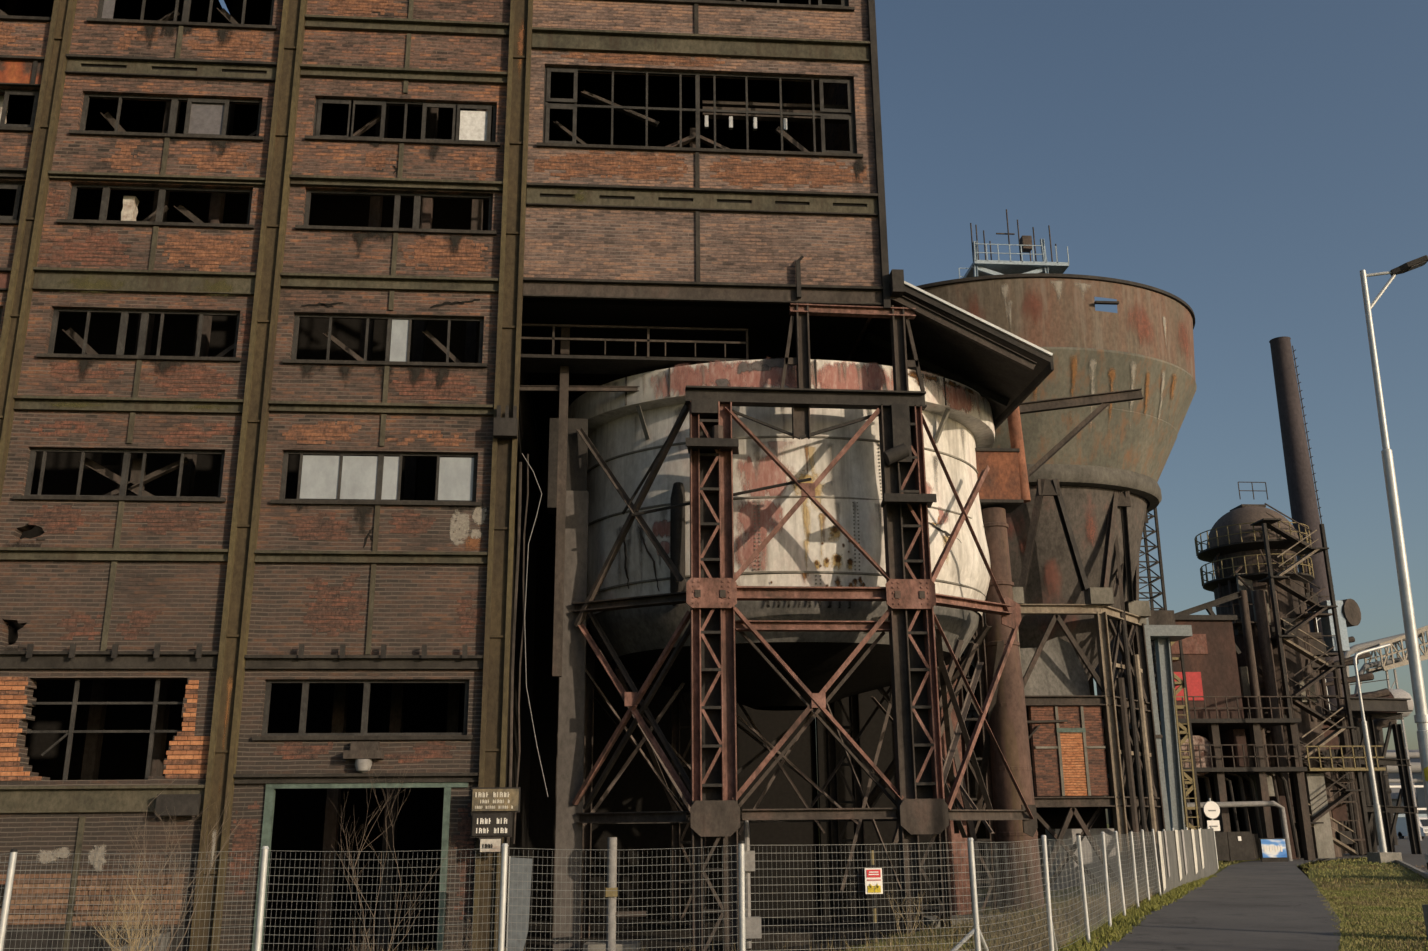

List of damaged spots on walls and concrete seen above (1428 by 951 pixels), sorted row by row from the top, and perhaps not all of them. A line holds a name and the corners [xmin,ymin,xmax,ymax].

spalling [8,505,110,547]
flaking render [450,506,487,549]
rust [793,447,879,587]
flaking render [0,677,42,781]
flaking render [163,680,210,779]